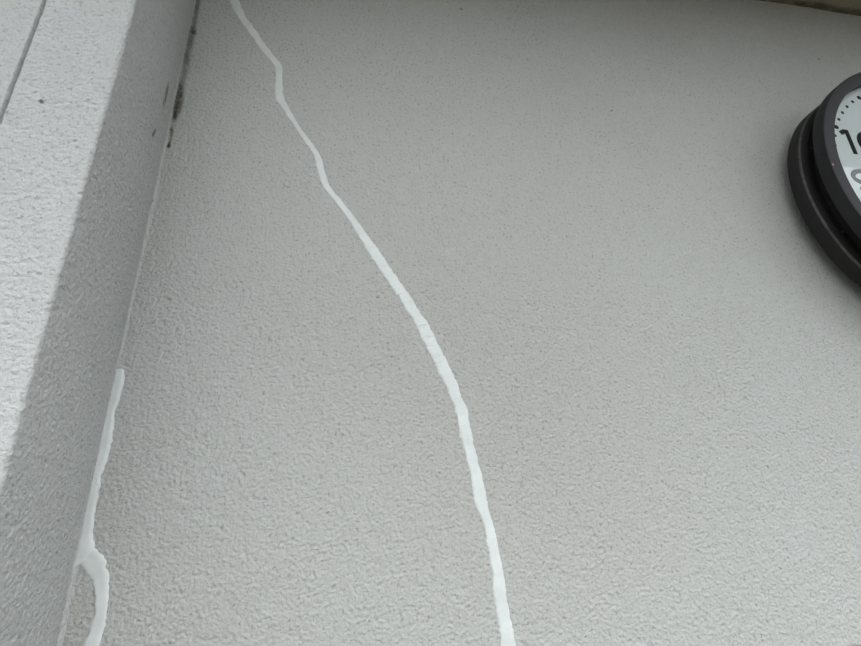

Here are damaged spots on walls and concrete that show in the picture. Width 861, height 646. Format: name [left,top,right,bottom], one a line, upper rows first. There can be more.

crack [74,369,125,646]
crack [230,0,516,646]